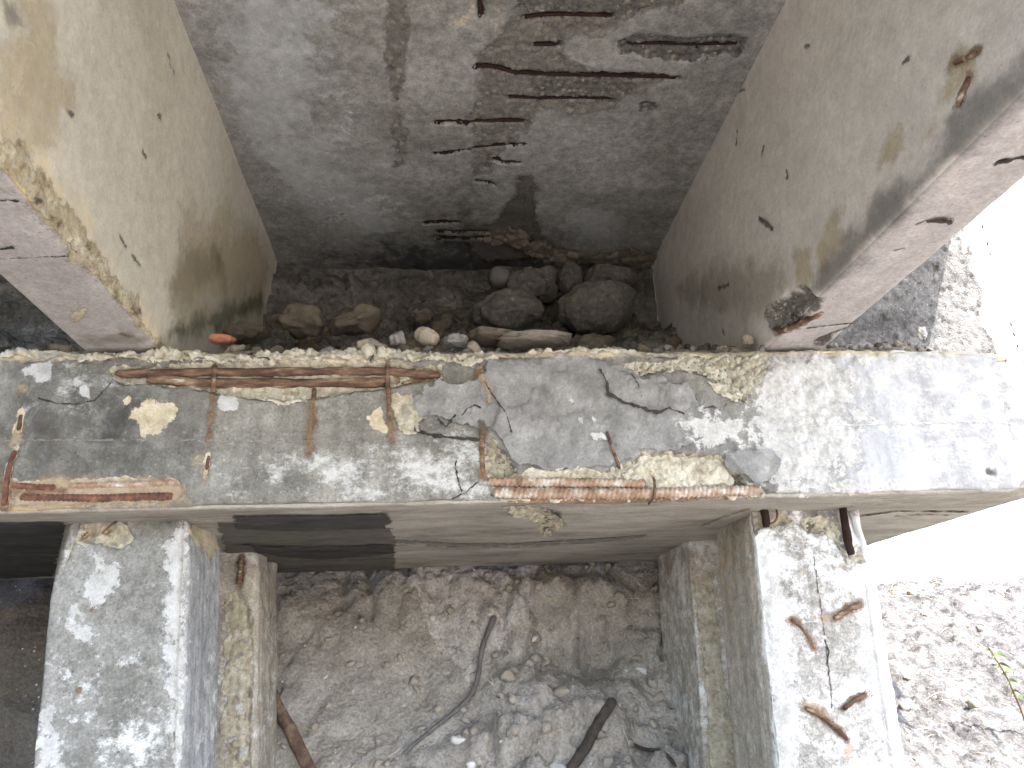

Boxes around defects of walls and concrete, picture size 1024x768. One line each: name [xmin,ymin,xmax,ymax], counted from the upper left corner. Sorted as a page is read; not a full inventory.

spalling [433,0,748,185]
spalling [0,139,707,479]
spalling [764,287,824,335]
spalling [0,407,187,512]
crack [451,461,478,499]
peeling [394,332,901,768]
crack [599,369,727,415]
crack [813,557,833,708]